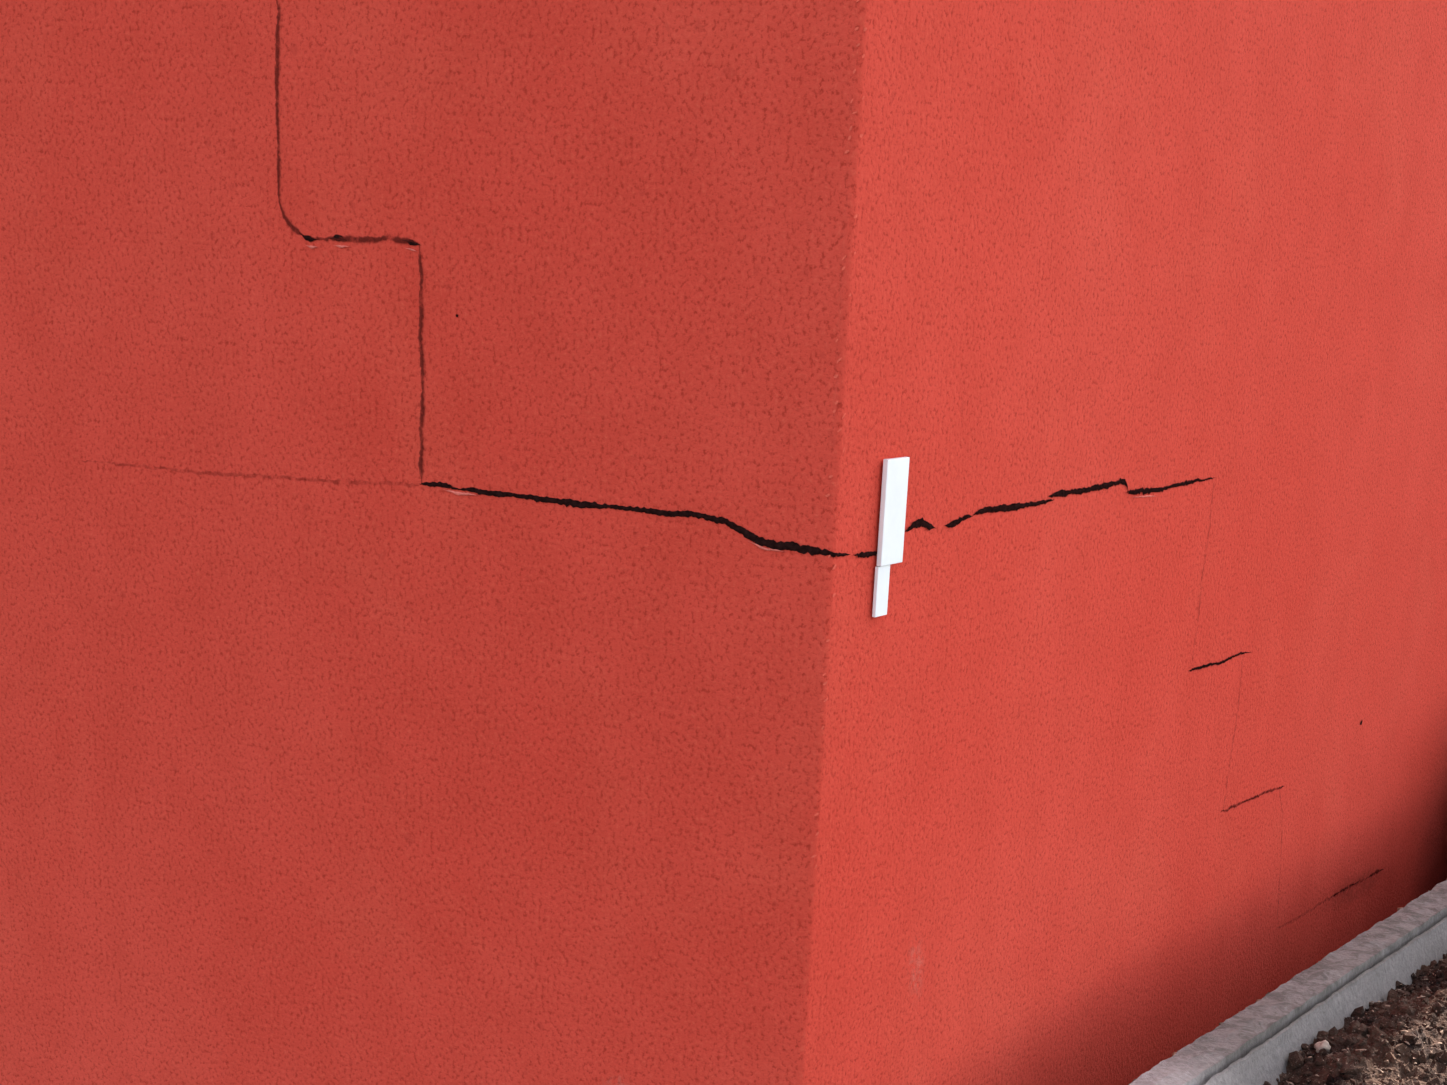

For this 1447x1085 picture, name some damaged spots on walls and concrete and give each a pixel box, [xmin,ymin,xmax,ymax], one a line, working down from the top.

crack [275,1,877,558]
crack [905,477,1214,532]
crack [1189,652,1250,671]
crack [1221,786,1284,812]
crack [1333,869,1383,896]